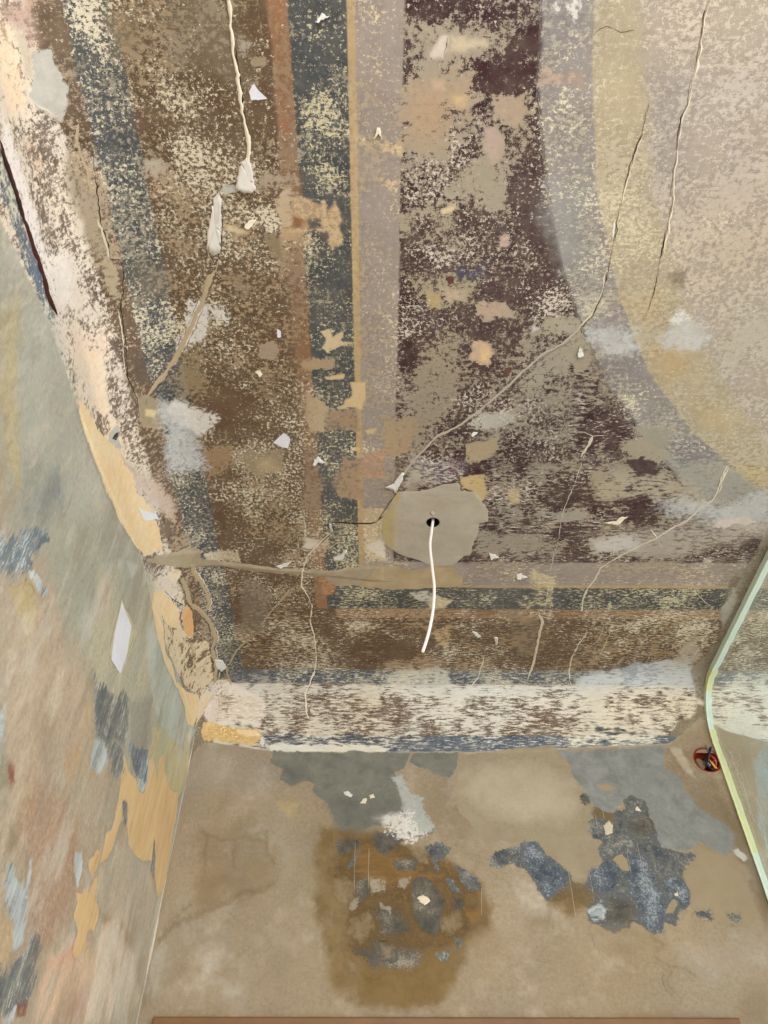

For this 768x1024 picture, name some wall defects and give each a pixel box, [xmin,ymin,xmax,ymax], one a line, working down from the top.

crack [0,140,58,315]
crack [75,0,256,432]
crack [642,1,711,322]
spalling [76,393,165,560]
crack [166,105,649,719]
crack [568,462,765,684]
peeling [72,753,180,962]
leakage [268,748,505,1017]
peeling [486,792,746,937]